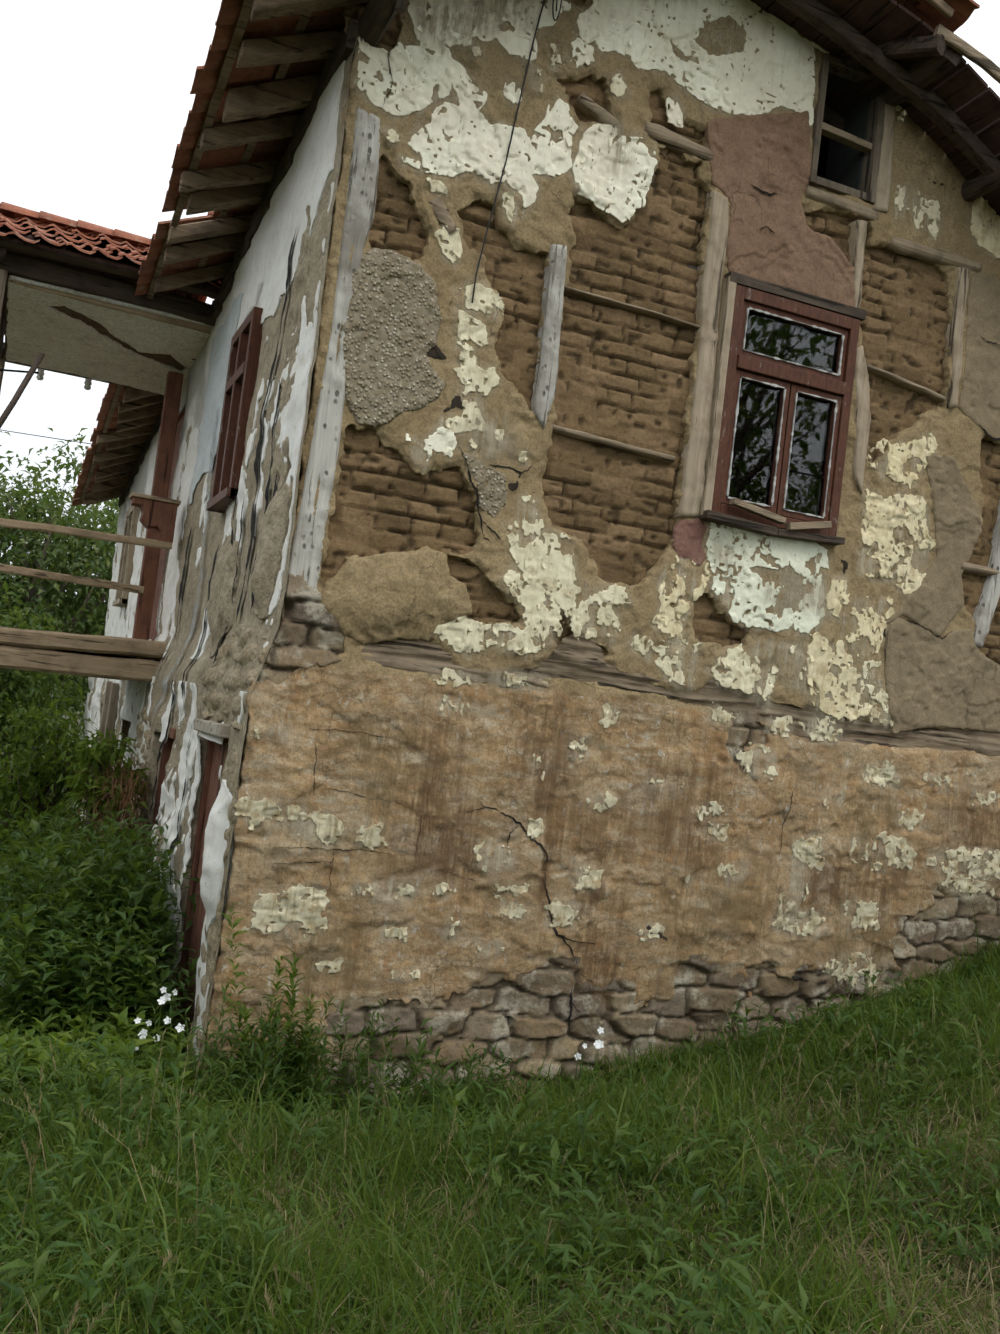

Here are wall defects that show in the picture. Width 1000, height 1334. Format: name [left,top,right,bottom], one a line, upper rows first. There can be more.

peeling [970,196,1000,258]
flaking render [52,0,949,1080]
flaking render [962,438,1000,616]
flaking render [980,597,1000,665]
peeling [922,773,957,791]
peeling [971,791,1000,806]
crack [468,800,595,1037]
flaking render [325,809,1000,1105]